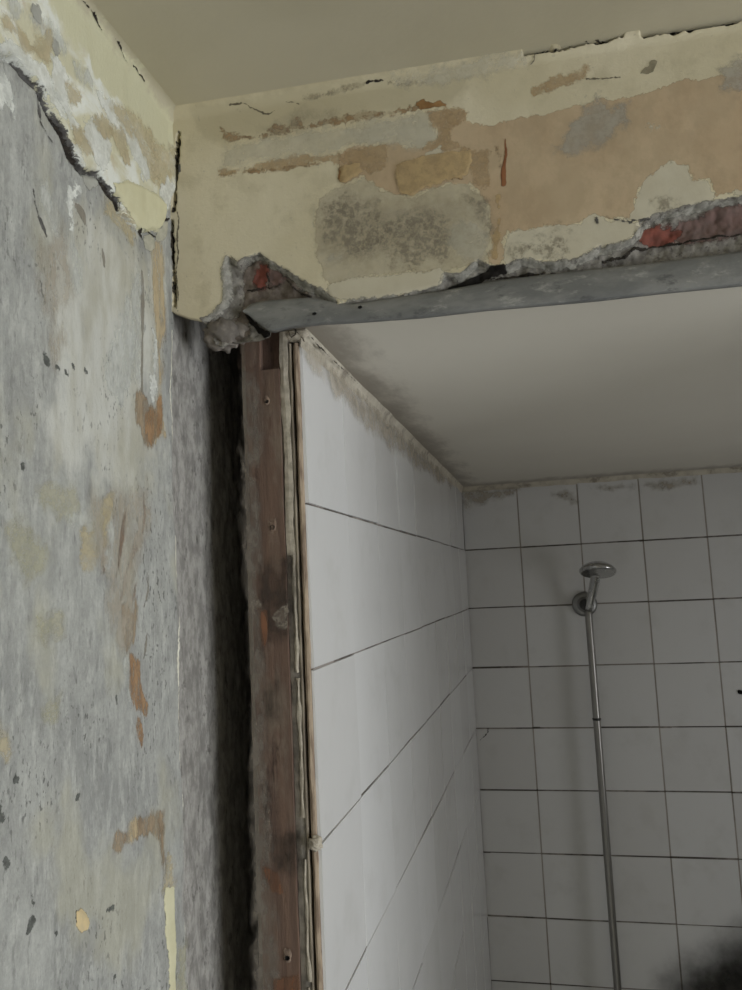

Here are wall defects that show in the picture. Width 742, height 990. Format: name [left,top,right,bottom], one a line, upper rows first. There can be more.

crack [534,23,737,55]
peeling [531,71,620,96]
flaking render [641,60,657,74]
crack [9,62,120,212]
peeling [0,0,178,251]
crack [229,101,299,115]
corrosion [496,139,507,186]
crack [171,132,181,309]
damp [315,178,491,284]
peeling [200,75,742,818]
damp [678,945,742,990]